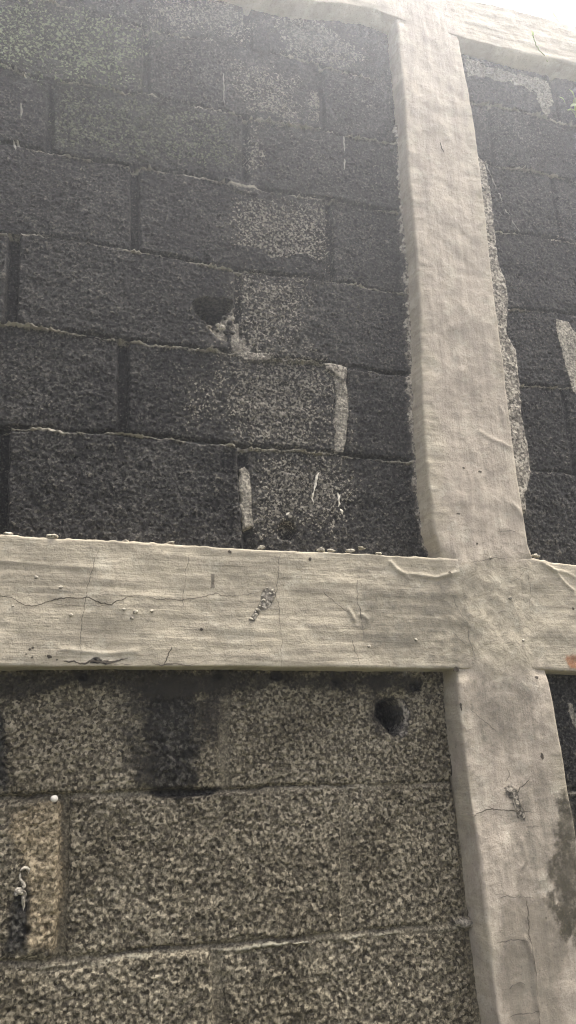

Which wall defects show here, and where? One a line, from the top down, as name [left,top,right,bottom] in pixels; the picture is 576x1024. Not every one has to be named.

crack [2,551,286,666]
damp [0,669,422,799]
crack [461,769,540,827]
damp [543,792,576,945]
crack [500,895,540,1024]